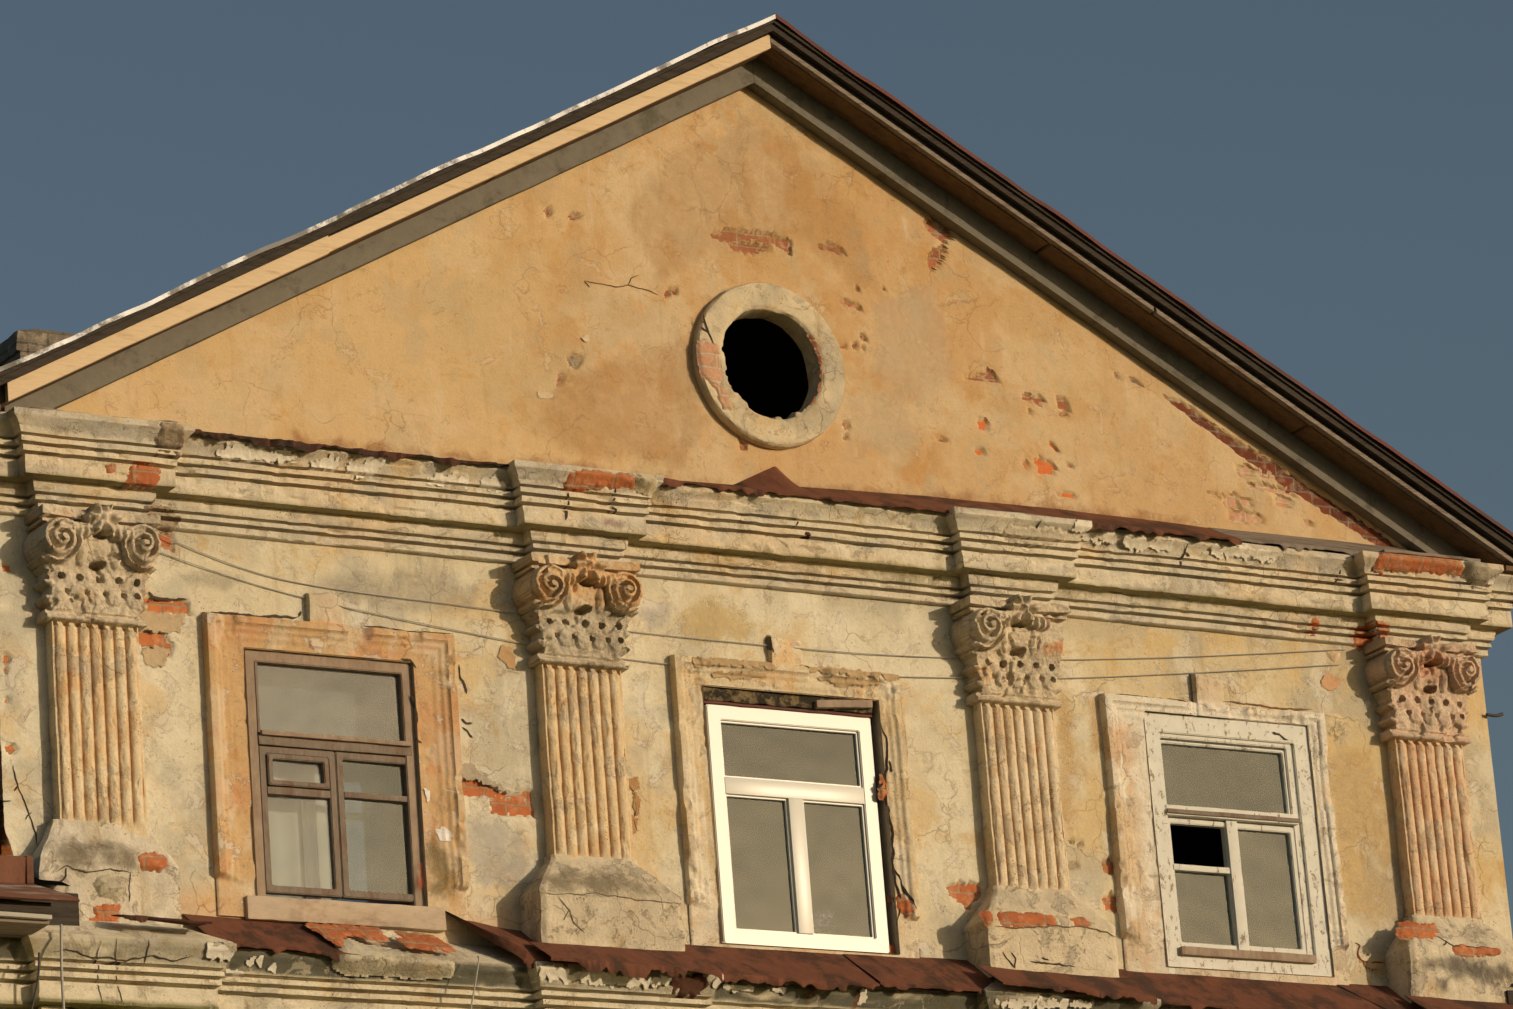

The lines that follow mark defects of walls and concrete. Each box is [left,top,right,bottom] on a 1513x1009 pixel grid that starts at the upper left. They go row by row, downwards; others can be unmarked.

crack [584,275,658,295]
spalling [696,338,733,411]
peeling [216,441,386,479]
peeling [427,472,507,493]
spalling [561,468,635,493]
flaking render [1169,400,1463,578]
spalling [999,520,1175,552]
peeling [138,598,190,668]
spalling [462,763,534,818]
spalling [946,882,1090,929]
flaking render [305,922,456,953]
spalling [1452,944,1501,958]